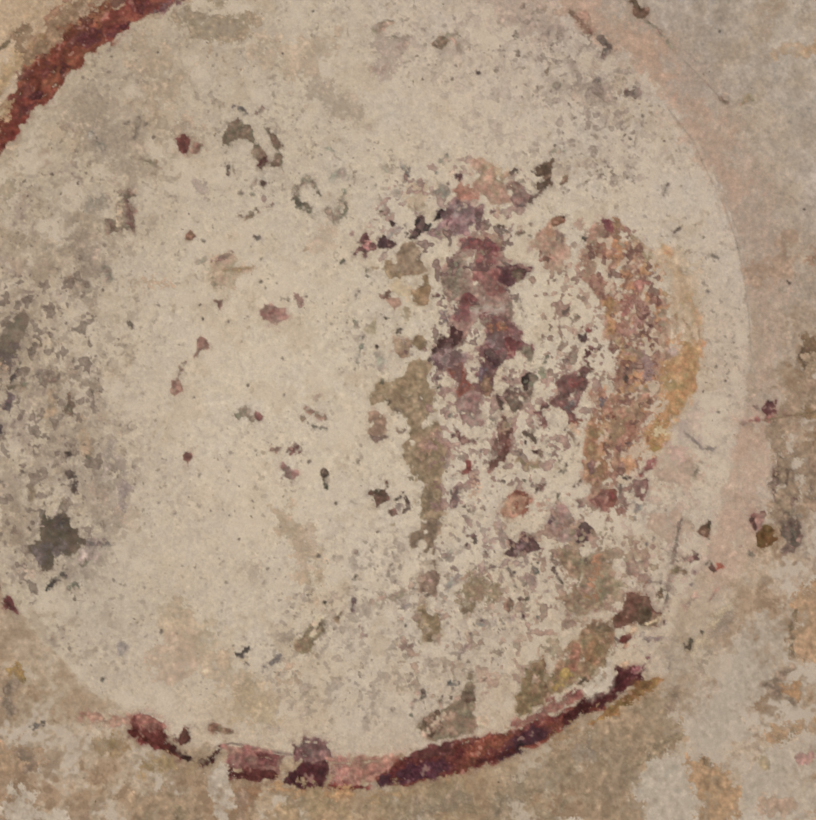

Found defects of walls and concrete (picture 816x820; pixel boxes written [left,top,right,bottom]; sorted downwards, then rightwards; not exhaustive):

peeling [561,5,603,42]
peeling [607,0,680,56]
peeling [101,186,142,238]
peeling [0,345,81,423]
peeling [164,102,727,744]